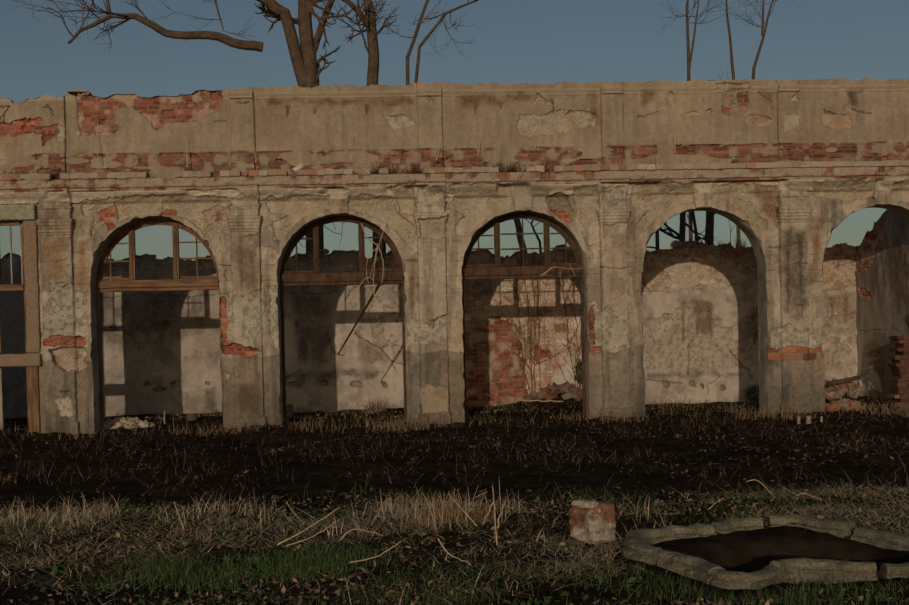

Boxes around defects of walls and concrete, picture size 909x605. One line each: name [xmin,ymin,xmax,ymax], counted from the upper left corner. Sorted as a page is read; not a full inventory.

flaking render [0,116,66,145]
flaking render [75,90,223,136]
spalling [516,91,598,137]
spalling [667,81,751,115]
spalling [710,180,781,213]
flaking render [856,178,909,272]
spalling [40,282,91,372]
spalling [220,284,301,368]
spalling [355,284,449,363]
flaking render [465,315,530,407]
spalling [588,301,632,354]
spalling [644,301,883,392]